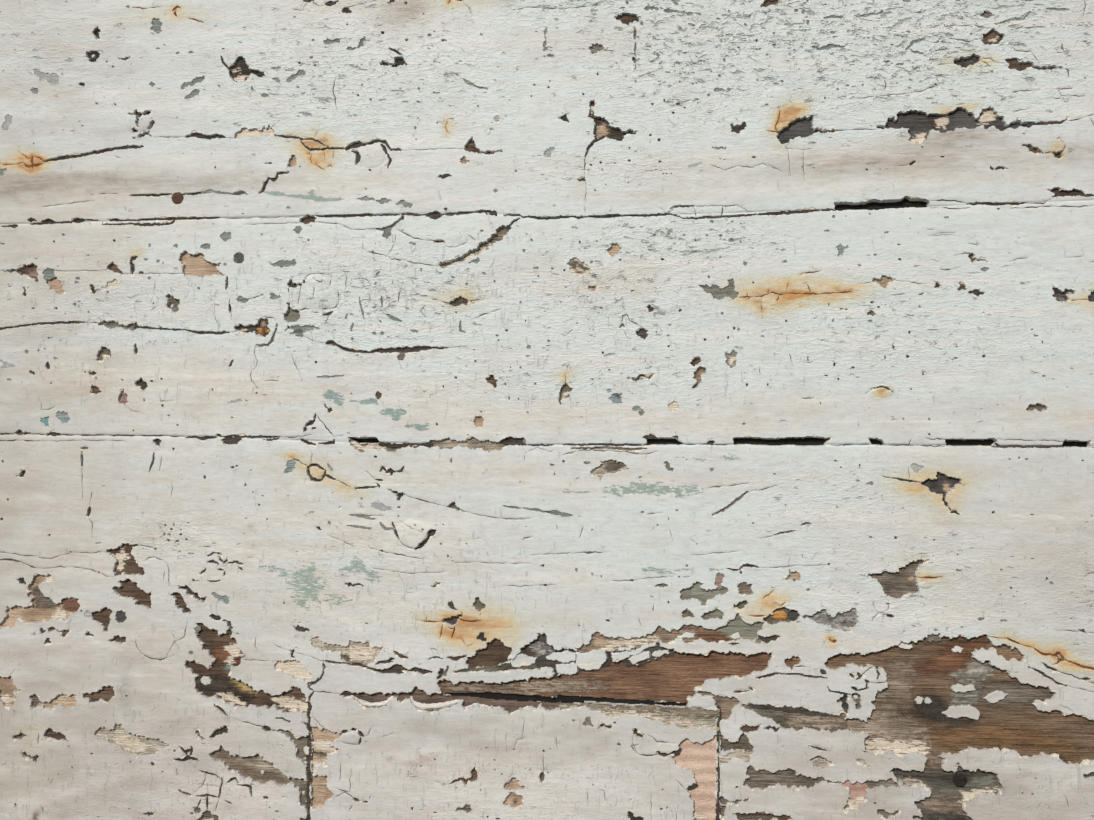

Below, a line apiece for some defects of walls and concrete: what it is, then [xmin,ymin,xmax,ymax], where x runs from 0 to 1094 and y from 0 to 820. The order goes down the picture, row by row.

rust [767,106,807,133]
peeling [877,109,1029,148]
rust [0,153,48,173]
crack [0,321,97,330]
crack [46,229,501,381]
rust [738,271,857,313]
peeling [0,544,152,644]
peeling [295,625,382,665]
crack [247,639,537,691]
rust [989,636,1094,670]
peeling [351,560,1094,820]
crack [216,705,390,810]